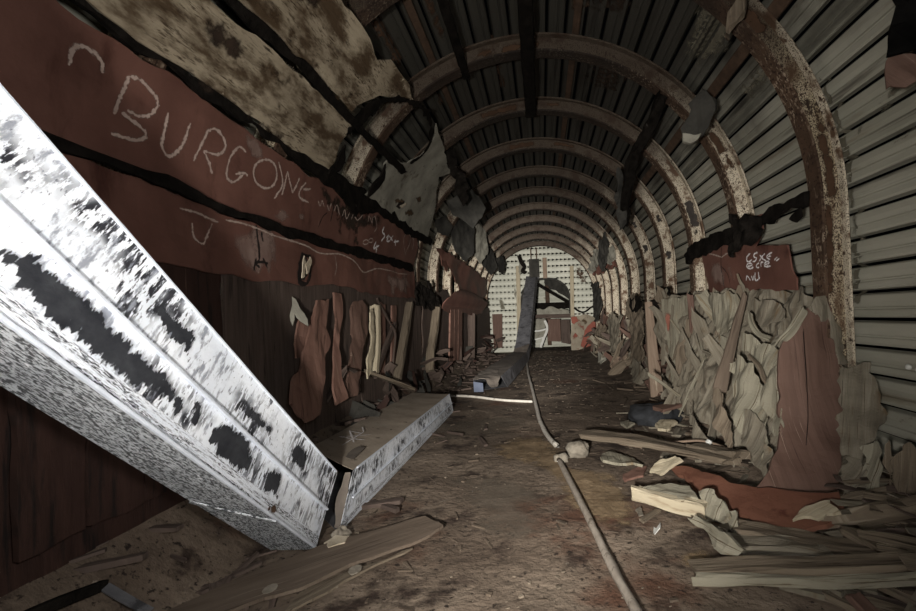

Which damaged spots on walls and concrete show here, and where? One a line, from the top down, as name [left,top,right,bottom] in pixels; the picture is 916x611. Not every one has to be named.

corrosion [708,131,735,168]
corrosion [814,108,842,294]
peeling [708,290,740,336]
peeling [742,332,785,436]
peeling [589,388,738,482]
peeling [714,461,761,487]
peeling [779,587,885,601]